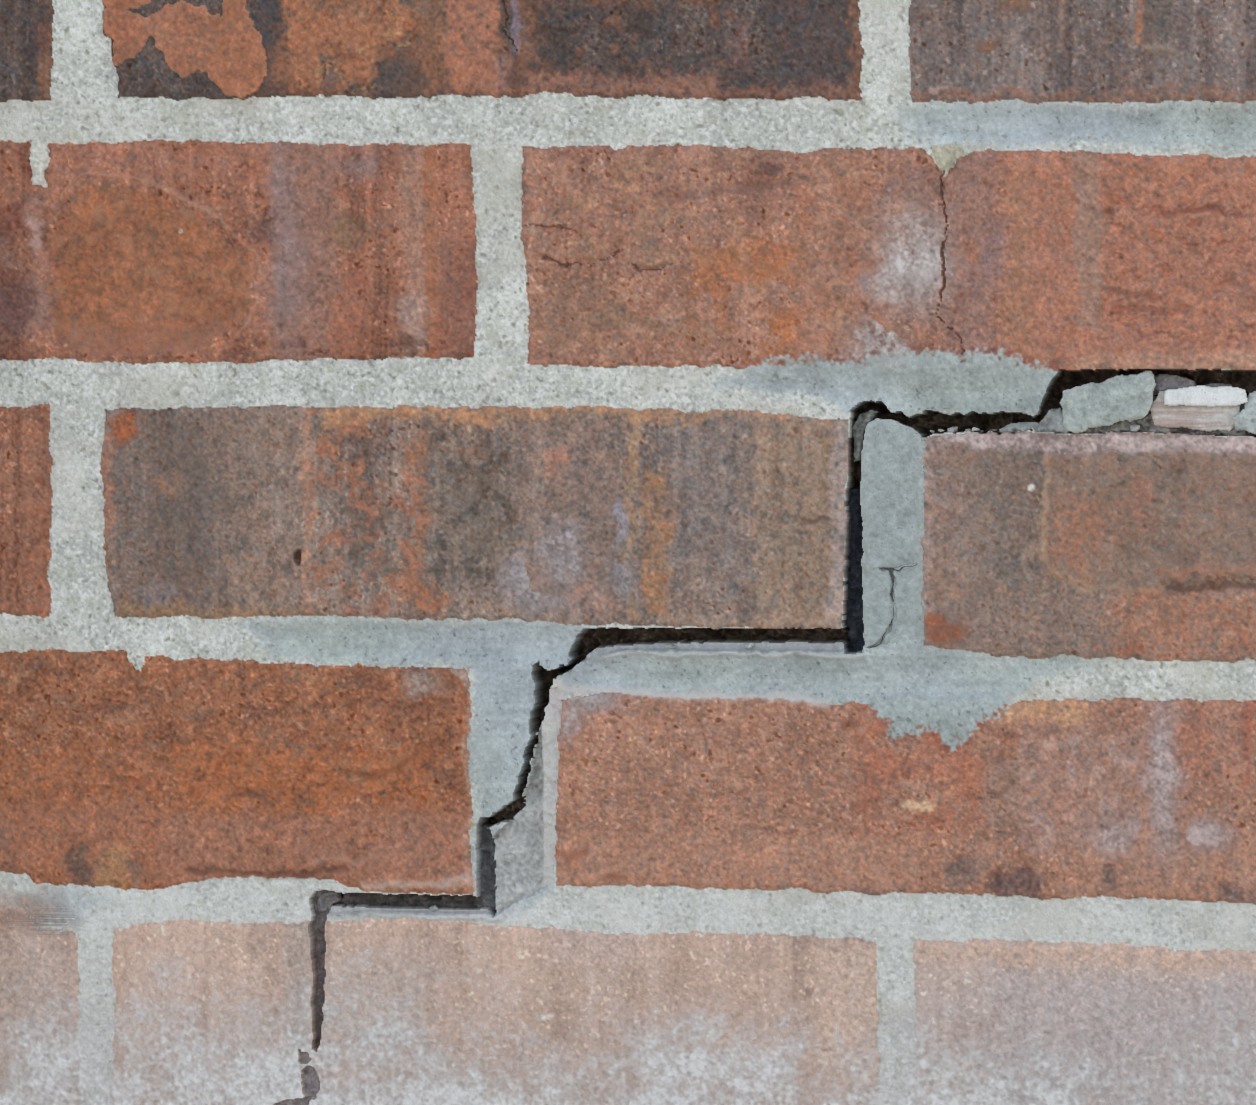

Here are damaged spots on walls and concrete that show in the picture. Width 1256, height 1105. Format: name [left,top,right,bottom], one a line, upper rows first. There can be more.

peeling [102,0,269,100]
peeling [278,0,422,99]
crack [935,170,965,355]
crack [273,368,1256,1105]